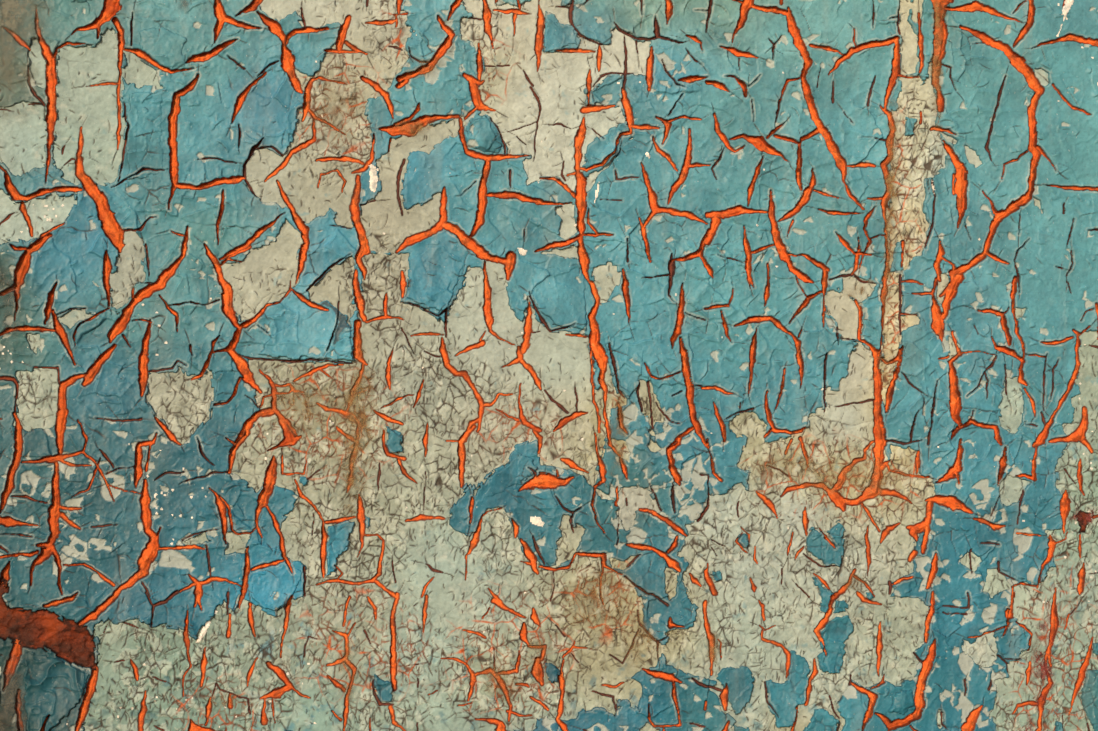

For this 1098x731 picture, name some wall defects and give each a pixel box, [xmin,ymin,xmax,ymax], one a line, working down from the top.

peeling [13,368,59,432]
rust [0,577,96,670]
peeling [23,652,90,731]
peeling [0,29,164,245]
crack [0,0,403,697]
peeling [82,0,957,731]
crack [511,283,733,676]
crack [360,0,1006,580]
crack [848,553,970,731]
crack [898,0,1098,485]
peeling [960,330,1098,731]
crack [968,459,1097,731]